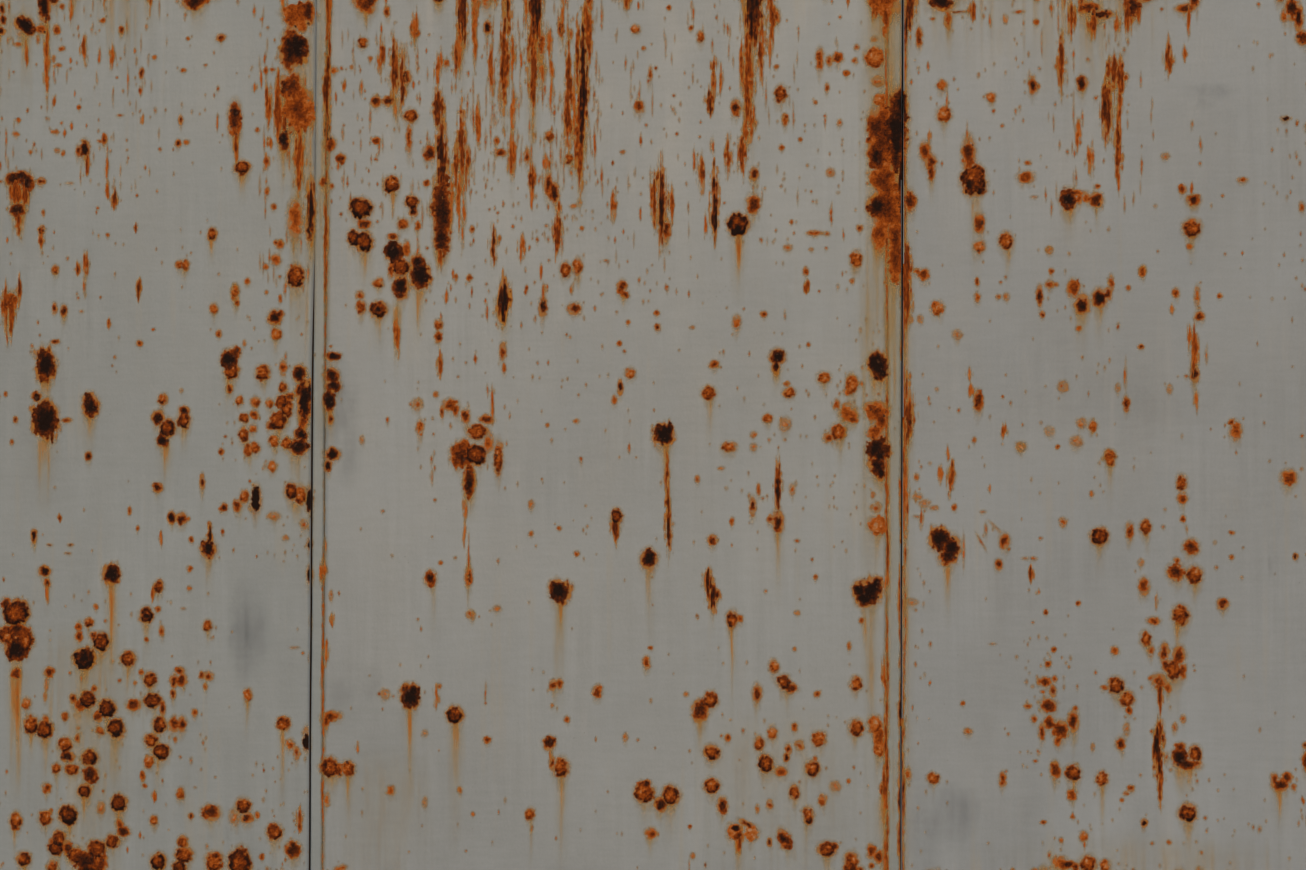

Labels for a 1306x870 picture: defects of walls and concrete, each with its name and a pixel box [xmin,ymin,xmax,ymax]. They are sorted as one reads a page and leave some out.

rust [175,246,191,272]
rust [200,227,218,249]
rust [151,389,191,461]
rust [216,0,958,870]
rust [159,511,194,546]
rust [207,480,254,534]
rust [1090,527,1109,547]
rust [1164,475,1244,588]
rust [151,579,164,636]
rust [1217,598,1229,610]
rust [1095,560,1209,809]
rust [1178,795,1207,832]